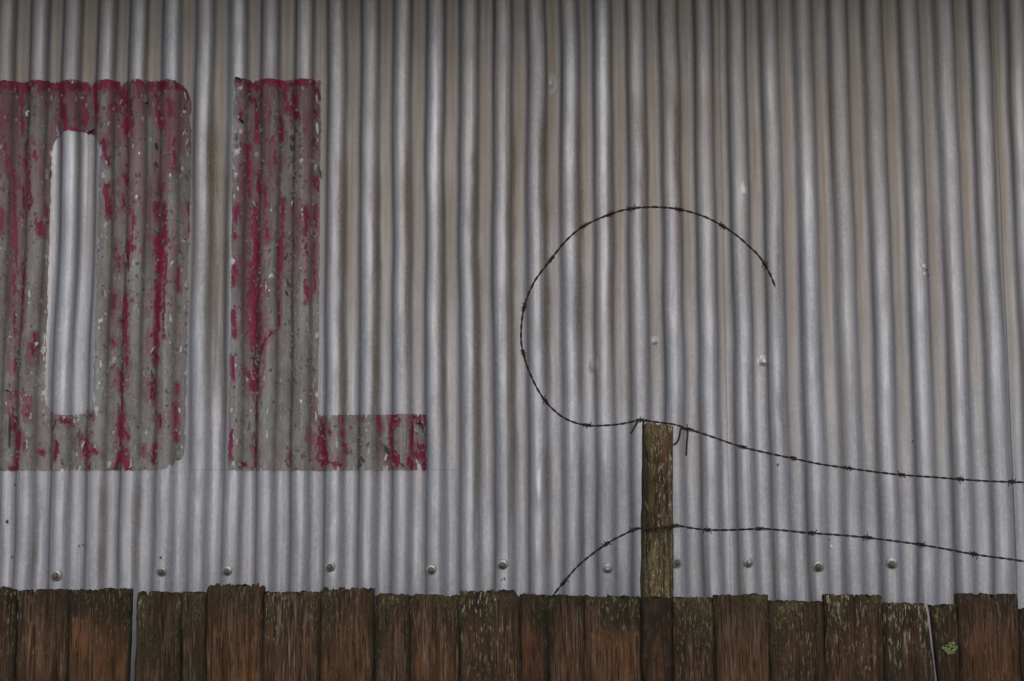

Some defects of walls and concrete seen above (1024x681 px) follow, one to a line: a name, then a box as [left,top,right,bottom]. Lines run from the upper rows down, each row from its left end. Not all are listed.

peeling [0,79,190,471]
peeling [228,77,322,469]
peeling [284,414,426,471]